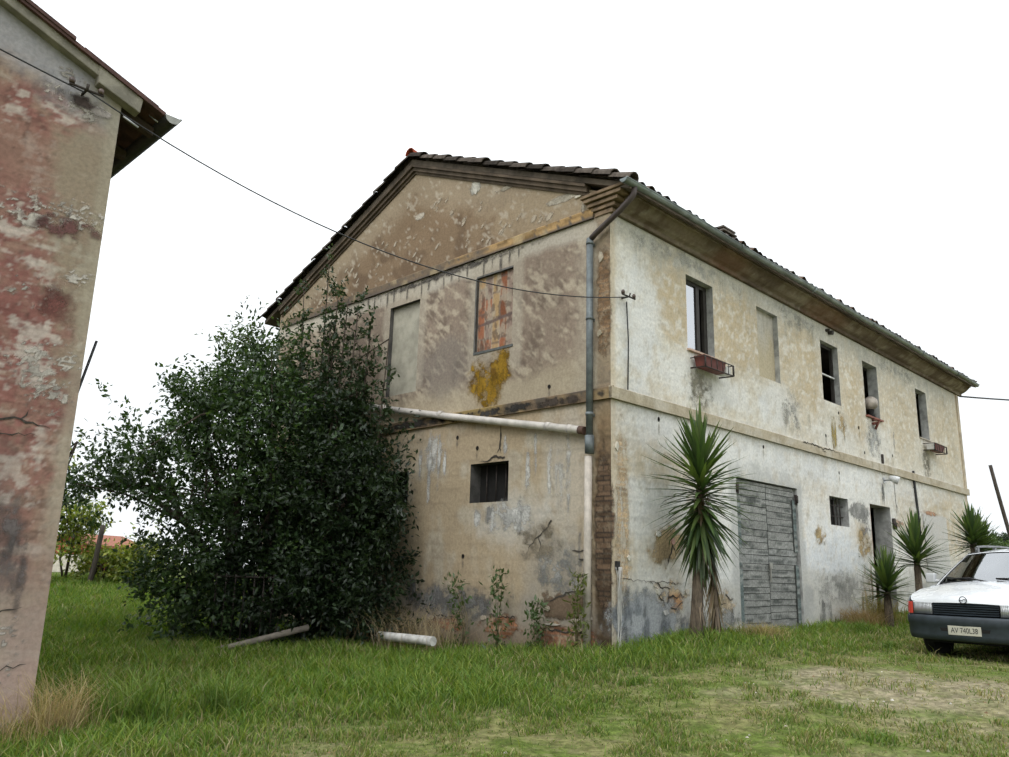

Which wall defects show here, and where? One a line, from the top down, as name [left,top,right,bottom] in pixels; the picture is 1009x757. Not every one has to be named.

peeling [0,191,105,238]
peeling [470,182,482,212]
peeling [531,193,584,223]
peeling [65,270,91,284]
peeling [42,289,69,317]
peeling [4,341,83,404]
crack [0,410,49,436]
crack [523,520,553,558]
flaking render [719,591,735,615]